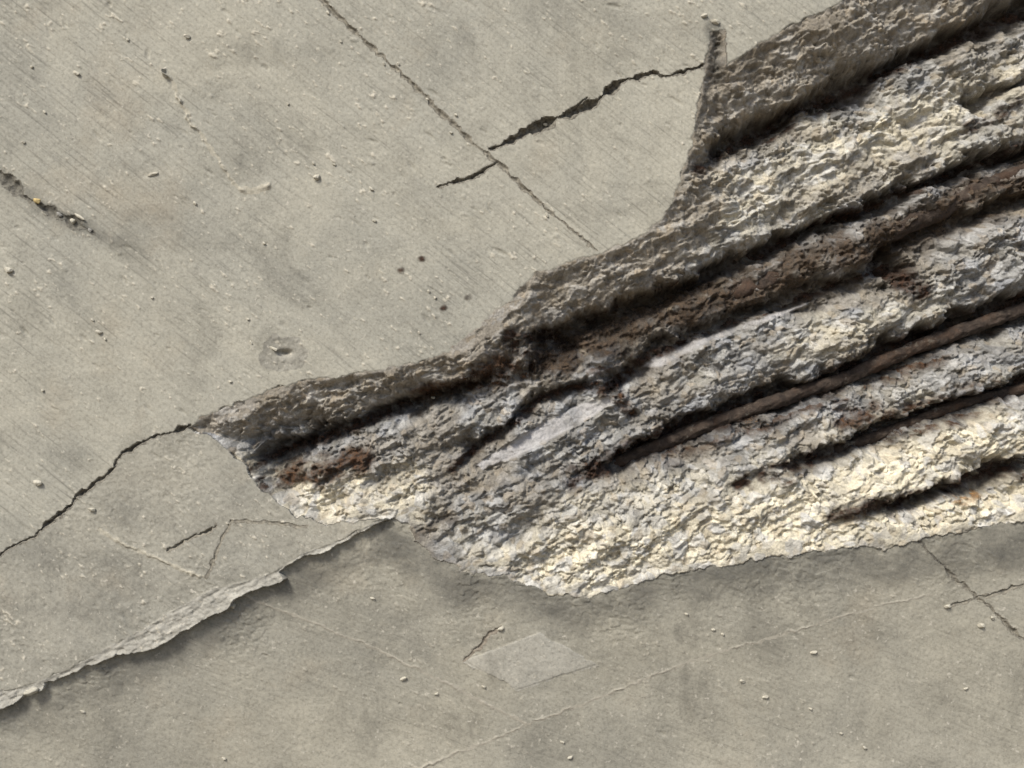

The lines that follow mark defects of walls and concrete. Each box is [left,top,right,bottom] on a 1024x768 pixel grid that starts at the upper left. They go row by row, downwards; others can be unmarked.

crack [436,63,705,189]
spalling [189,0,1024,599]
corrosion [248,143,1024,490]
crack [0,423,193,558]
crack [166,522,218,553]
peeling [0,429,389,710]
crack [918,540,1024,641]